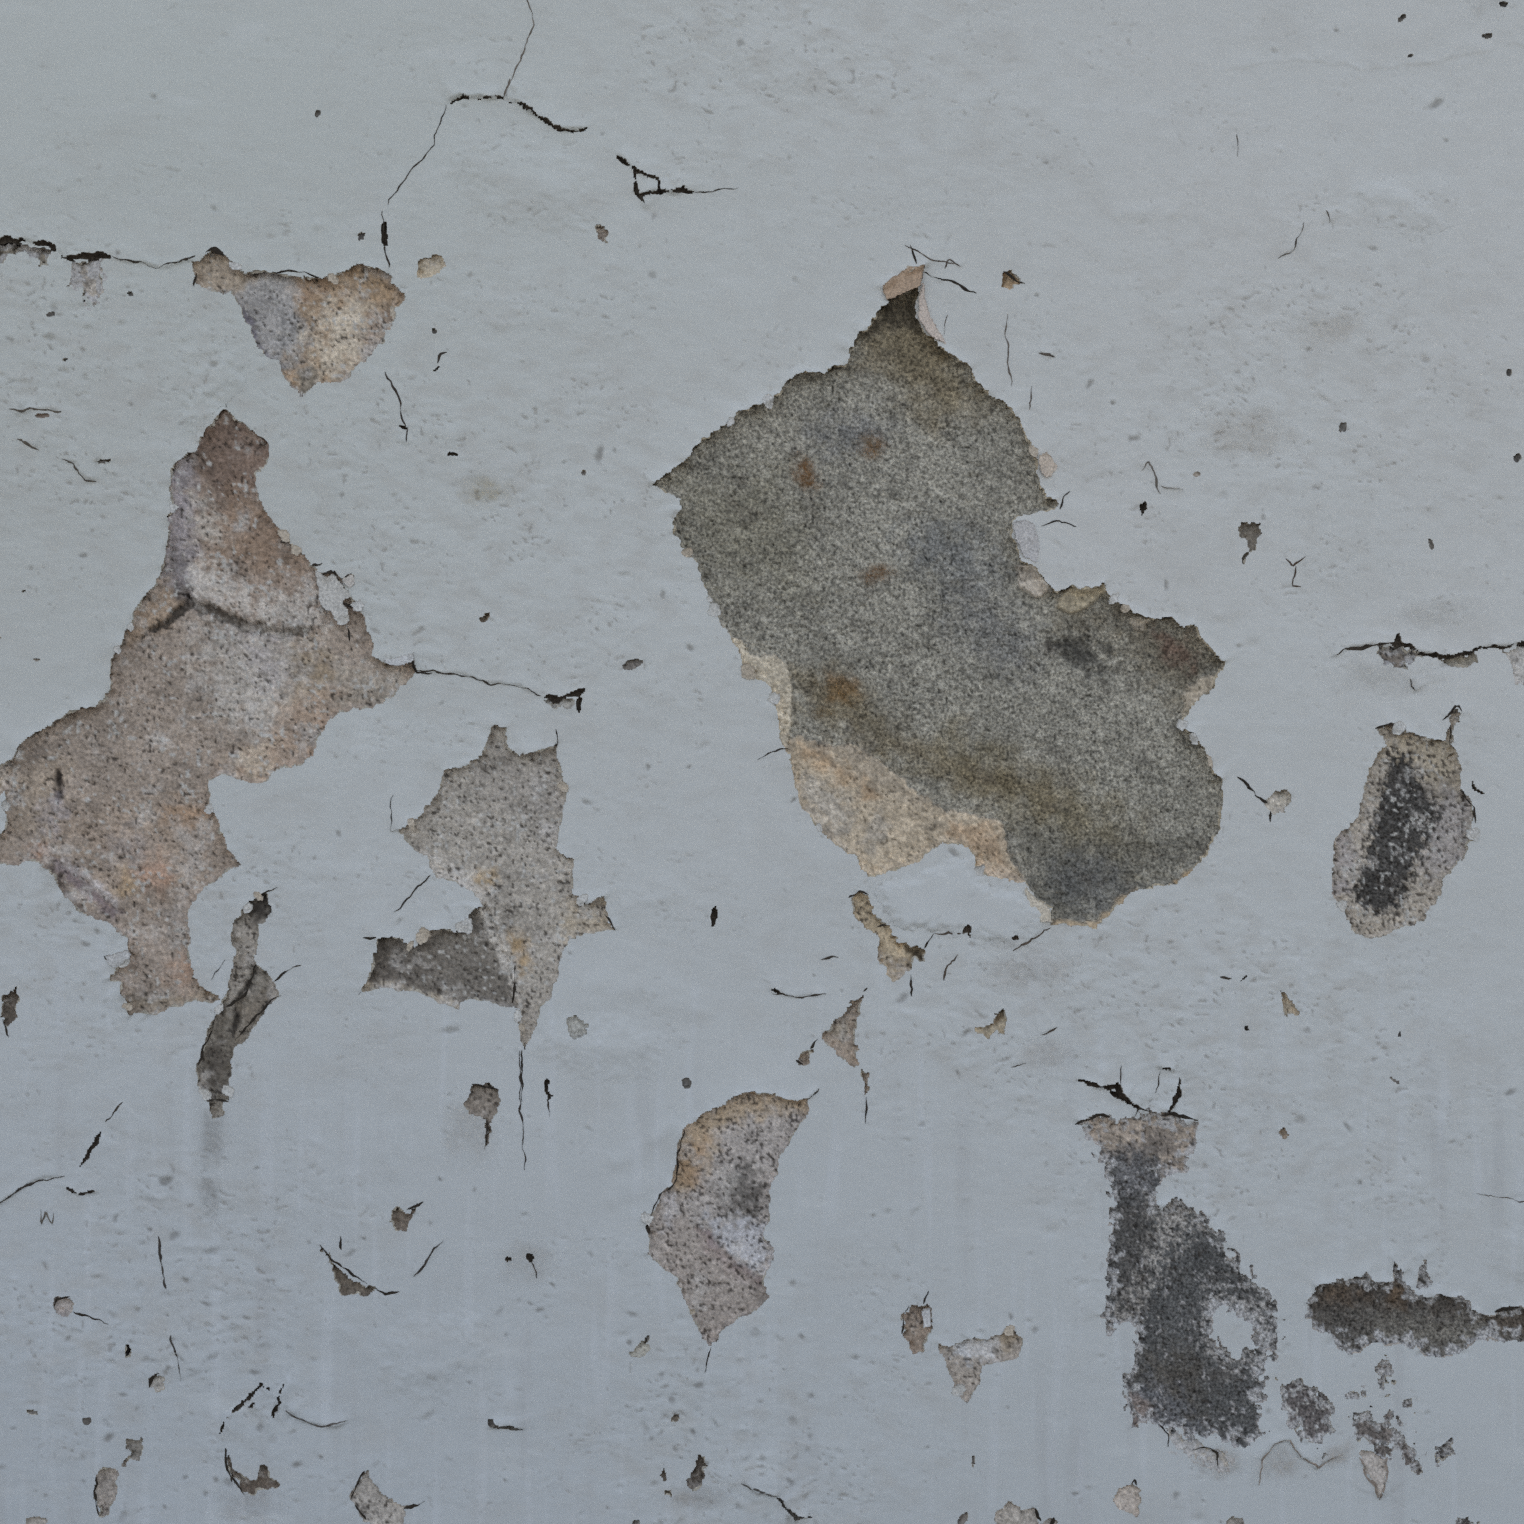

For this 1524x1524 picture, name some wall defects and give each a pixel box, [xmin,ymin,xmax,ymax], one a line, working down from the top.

crack [381,0,588,267]
crack [616,155,737,203]
peeling [191,247,406,397]
peeling [0,406,431,1119]
peeling [359,725,615,1101]
spalling [652,245,1291,996]
peeling [1331,705,1480,939]
crack [1337,633,1524,690]
peeling [463,1082,501,1146]
peeling [641,1089,819,1372]
spalling [1075,1107,1524,1500]
peeling [994,1501,1058,1524]